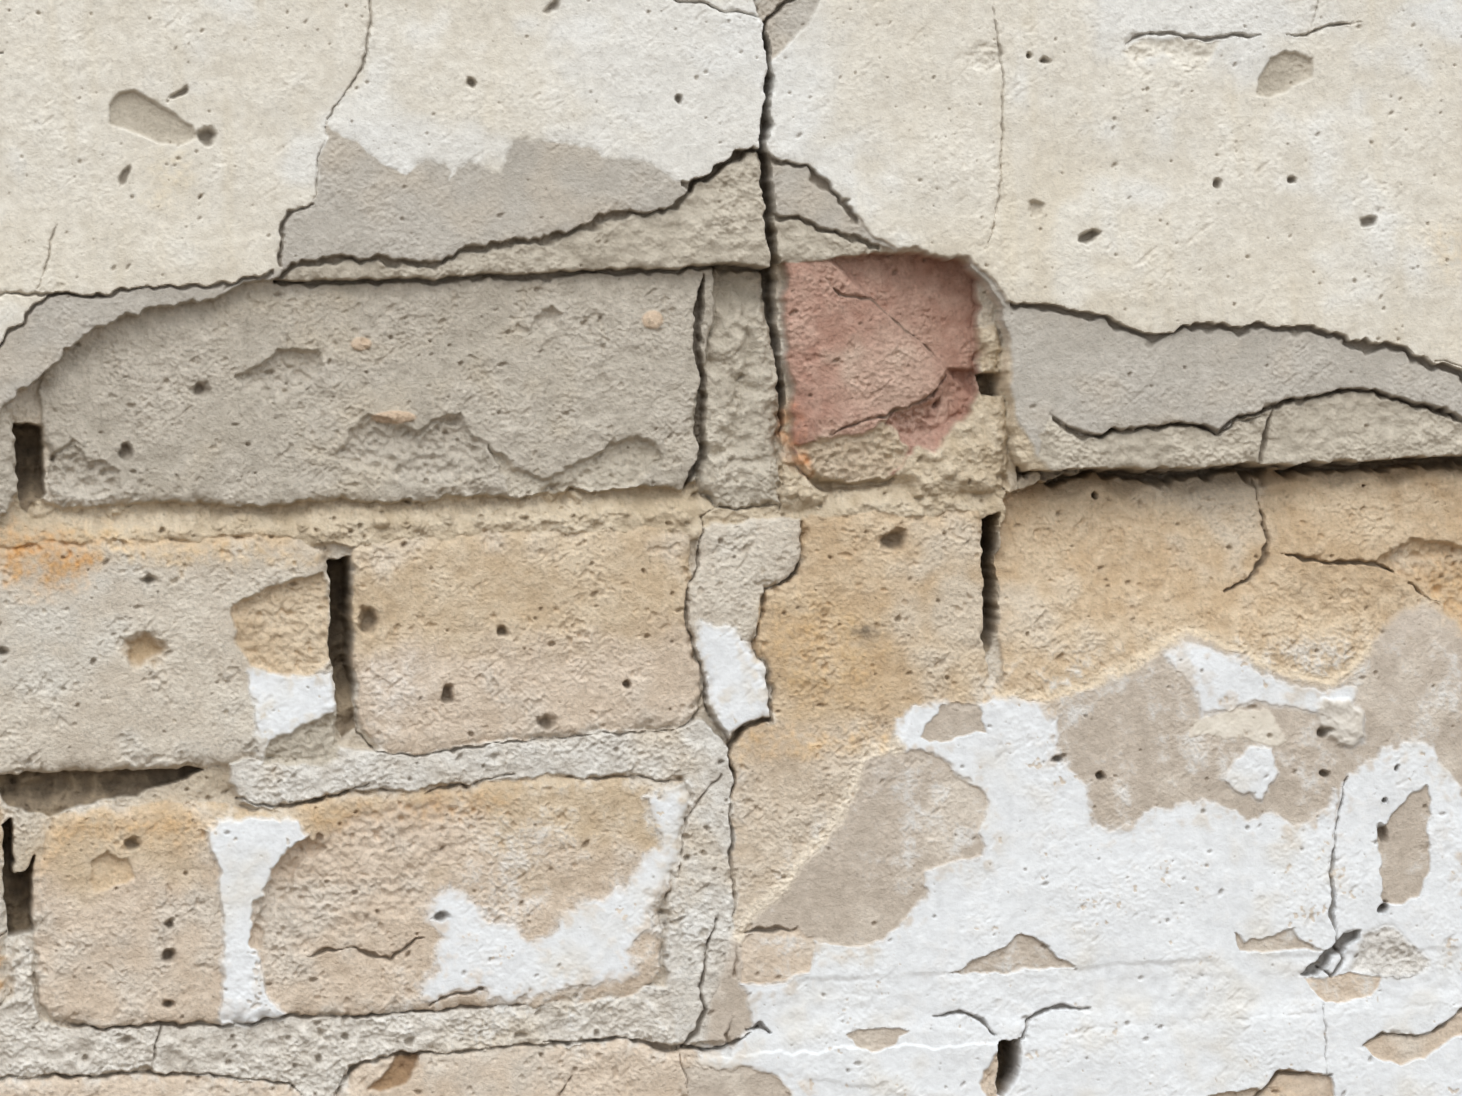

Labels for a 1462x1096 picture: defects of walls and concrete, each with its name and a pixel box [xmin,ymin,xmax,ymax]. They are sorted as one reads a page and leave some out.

crack [987,0,1006,246]
crack [1123,0,1362,52]
peeling [0,125,1462,500]
crack [826,278,948,438]
spalling [231,573,340,768]
crack [0,0,803,1096]
peeling [697,622,774,733]
spalling [1377,539,1462,587]
peeling [209,781,694,1025]
peeling [684,642,1462,1096]
crack [1254,777,1462,1096]
spalling [368,1055,419,1092]